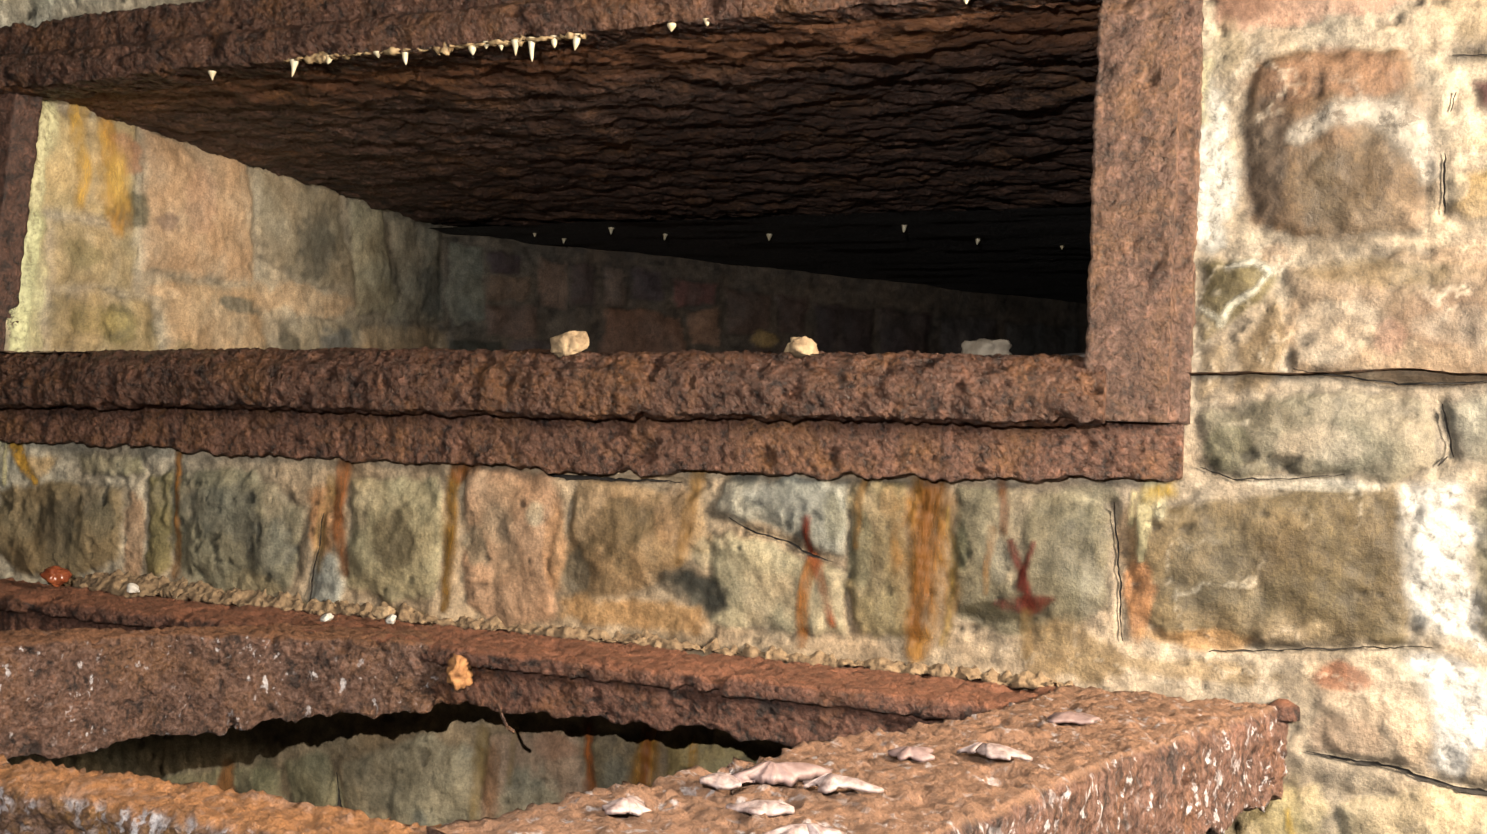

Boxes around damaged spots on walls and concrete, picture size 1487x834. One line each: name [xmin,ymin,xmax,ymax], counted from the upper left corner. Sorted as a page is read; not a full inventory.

rust [174,450,182,574]
rust [333,459,351,574]
rust [441,464,467,612]
rust [797,516,824,639]
rust [896,477,954,663]
rust [998,478,1053,613]
water stain [1402,484,1487,777]
rust [602,725,659,816]
rust [689,735,884,834]
rust [888,746,935,762]
rust [957,742,1033,761]
rust [1047,711,1100,725]